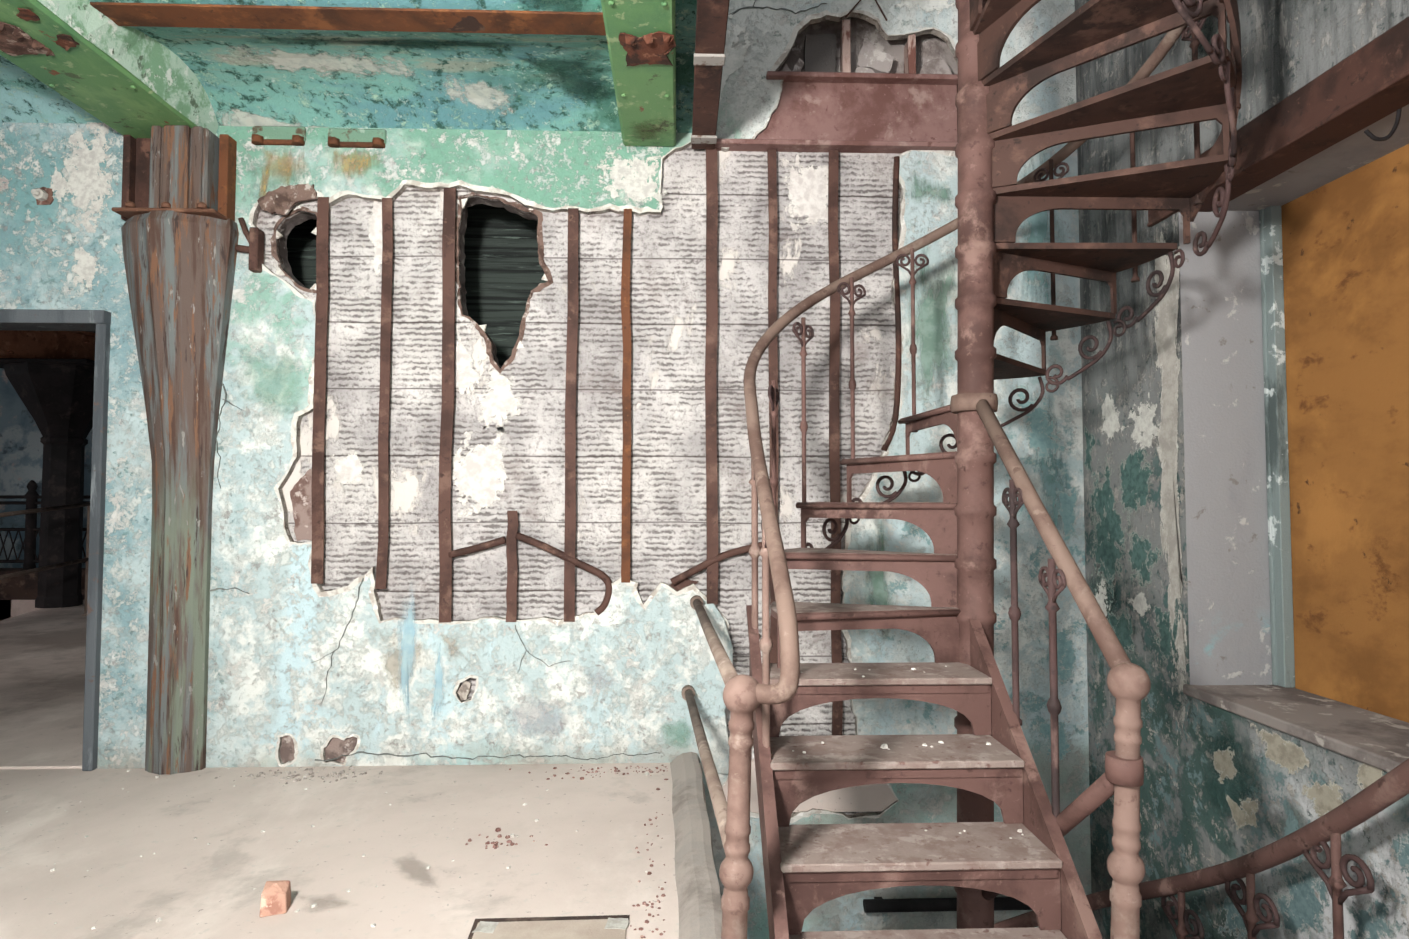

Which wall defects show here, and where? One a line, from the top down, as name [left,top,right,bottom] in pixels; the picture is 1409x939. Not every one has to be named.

spalling [248,0,958,675]
spalling [453,675,478,703]
spalling [779,699,858,736]
spalling [275,733,298,767]
spalling [320,734,361,766]
spalling [790,783,899,823]
peeling [1211,747,1259,830]
peeling [1250,723,1383,819]
peeling [1218,893,1260,939]
peeling [1272,865,1403,939]